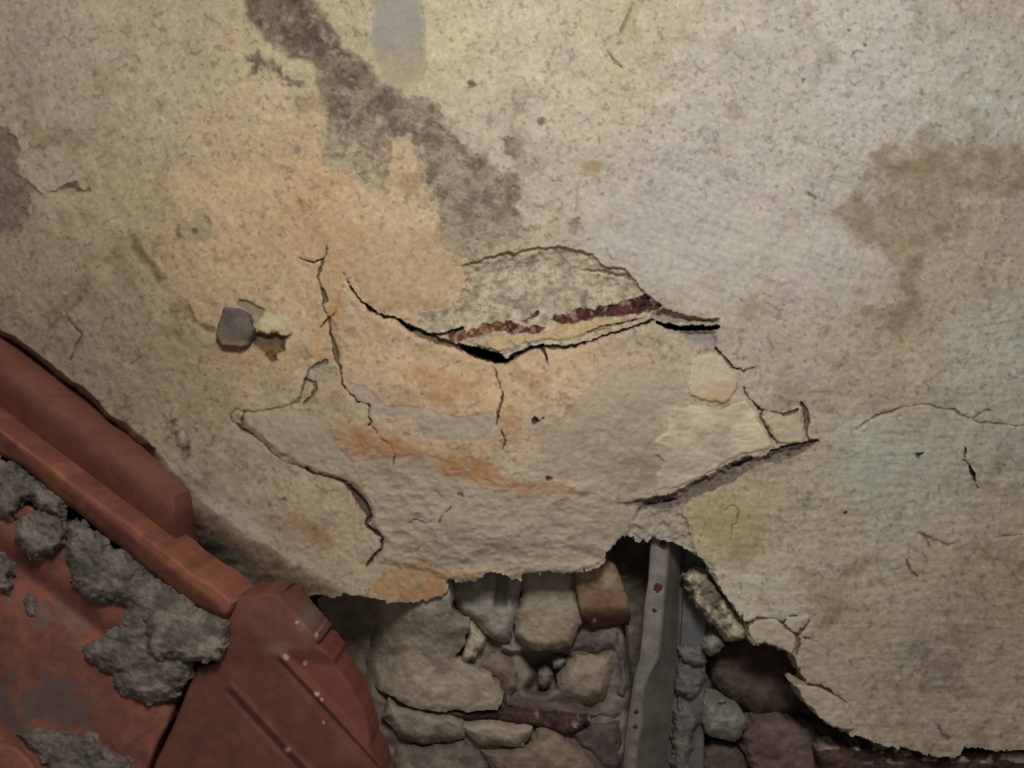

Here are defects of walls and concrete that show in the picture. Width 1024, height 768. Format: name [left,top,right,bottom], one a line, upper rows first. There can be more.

peeling [237,0,805,490]
rust [445,293,663,343]
damp [825,119,1024,344]
crack [230,244,819,567]
crack [855,404,1024,430]
crack [963,446,979,489]
flaking render [627,504,797,655]